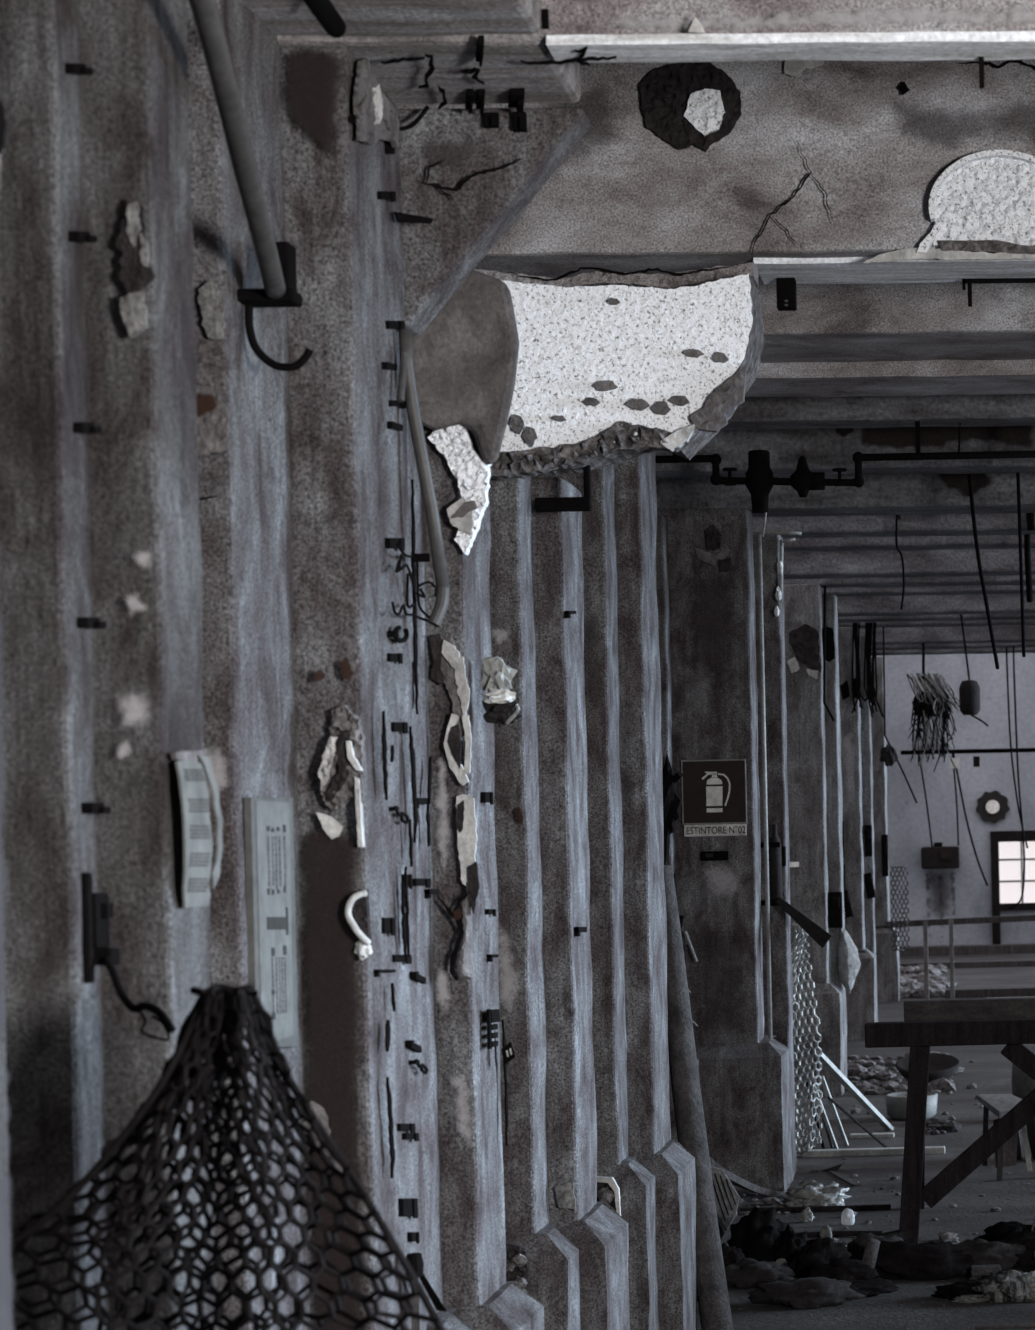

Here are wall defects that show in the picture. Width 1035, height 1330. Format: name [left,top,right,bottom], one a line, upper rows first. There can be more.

peeling [353,58,403,148]
crack [381,53,485,110]
crack [520,46,617,67]
spalling [640,62,742,152]
peeling [116,199,156,338]
crack [500,140,834,281]
spalling [427,262,765,555]
spalling [316,705,366,847]
peeling [429,634,480,915]
peeling [303,1101,343,1172]
peeling [0,1174,14,1330]